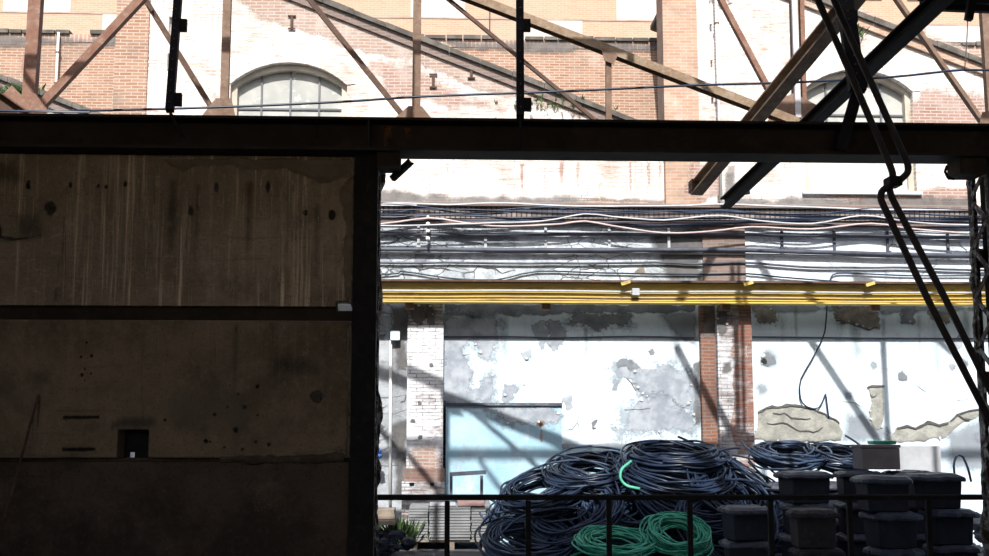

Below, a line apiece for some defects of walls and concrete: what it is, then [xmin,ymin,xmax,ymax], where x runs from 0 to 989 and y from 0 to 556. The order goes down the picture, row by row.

crack [409,264,513,277]
flaking render [521,310,633,360]
flaking render [411,304,573,425]
flaking render [611,349,701,441]
spalling [867,385,885,430]
spalling [889,408,979,443]